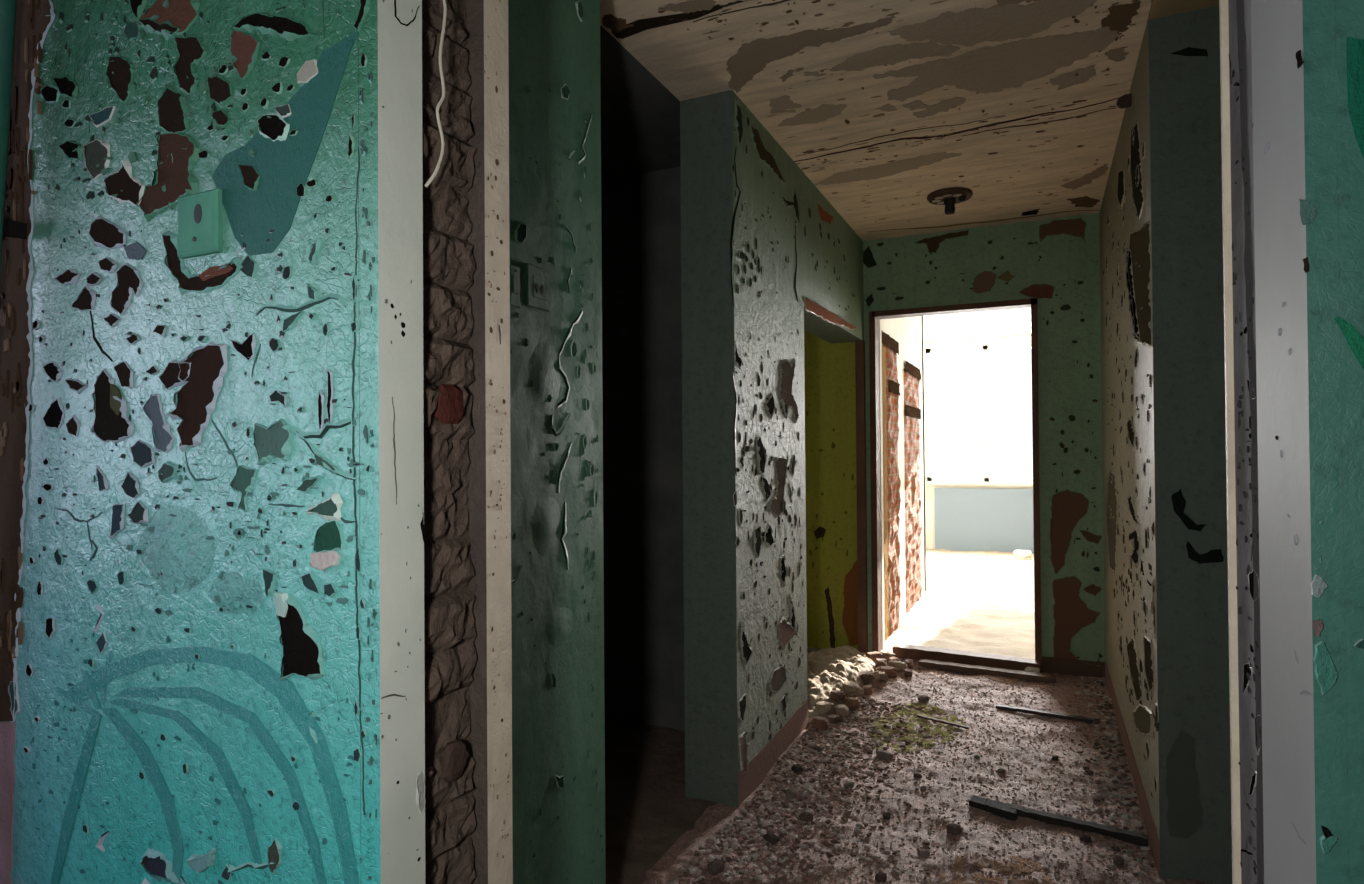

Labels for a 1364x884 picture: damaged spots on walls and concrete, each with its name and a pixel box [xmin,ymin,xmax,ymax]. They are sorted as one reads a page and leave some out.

peeling [726,0,1141,274]
spalling [0,0,329,723]
peeling [297,179,344,265]
peeling [734,340,742,369]
spalling [804,297,857,330]
peeling [973,270,1085,322]
spalling [1021,121,1159,761]
spalling [226,369,361,681]
peeling [733,358,801,715]
peeling [353,701,367,763]
peeling [738,622,772,775]
spalling [811,650,913,731]